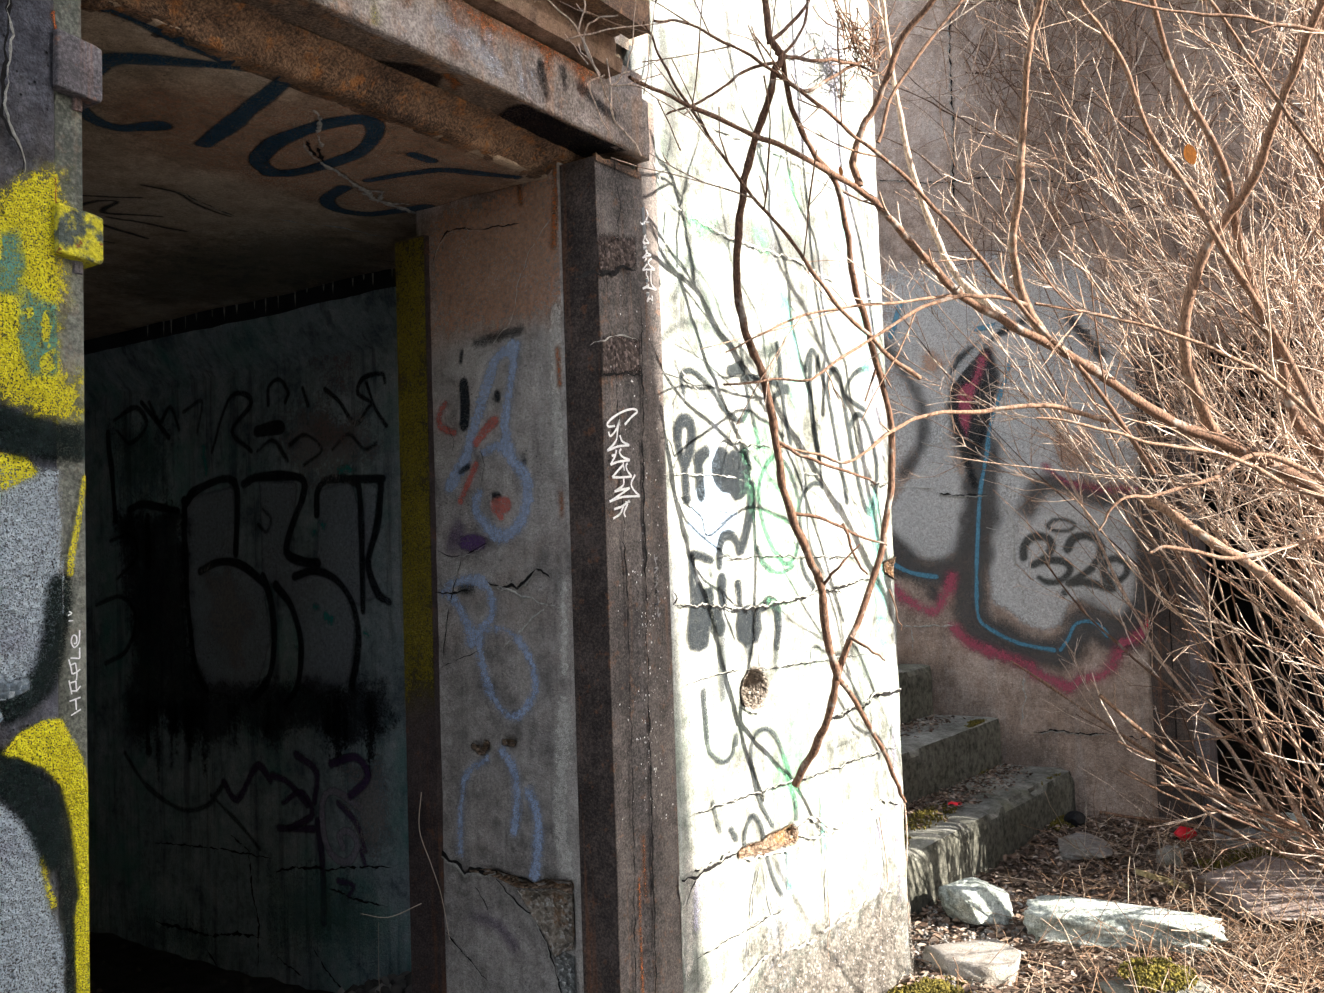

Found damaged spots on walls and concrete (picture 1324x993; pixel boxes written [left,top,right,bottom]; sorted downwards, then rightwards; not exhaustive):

crack [0,0,26,174]
corrosion [446,0,595,88]
crack [436,542,563,665]
crack [591,312,902,993]
crack [442,851,562,993]
spalling [465,868,576,993]